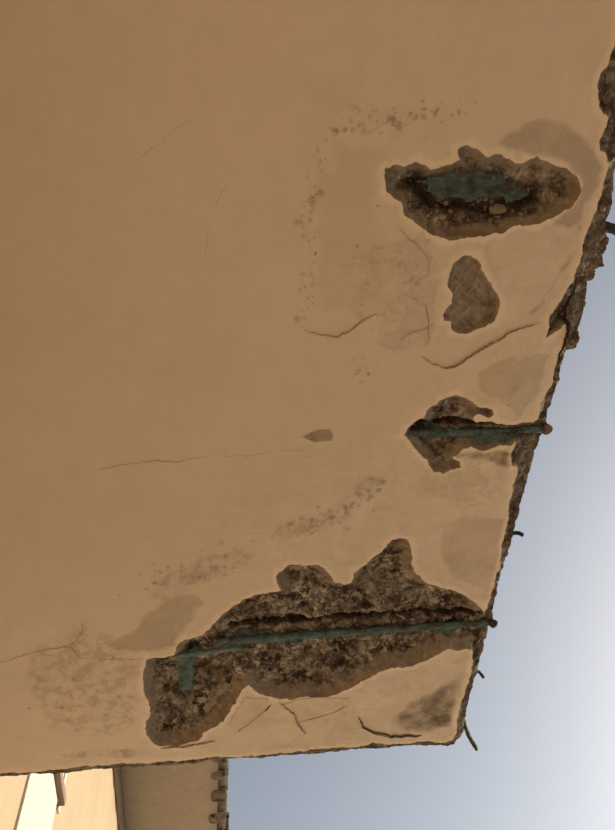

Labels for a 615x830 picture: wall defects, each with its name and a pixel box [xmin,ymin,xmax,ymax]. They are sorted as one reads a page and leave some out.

crack [303,313,386,337]
crack [398,230,534,369]
spalling [384,46,615,620]
peeling [303,430,333,442]
spalling [0,538,498,776]
crack [281,697,421,739]